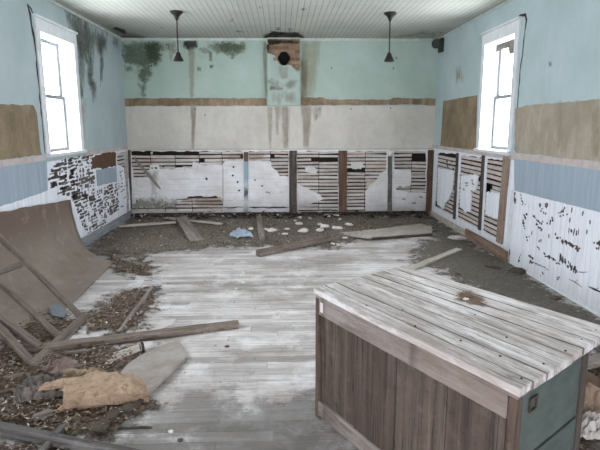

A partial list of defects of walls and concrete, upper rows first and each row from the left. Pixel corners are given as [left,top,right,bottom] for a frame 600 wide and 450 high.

damp [68,13,174,97]
damp [210,42,245,68]
flaking render [267,39,300,71]
flaking render [48,151,289,233]
flaking render [297,95,503,237]
peeling [522,203,591,274]